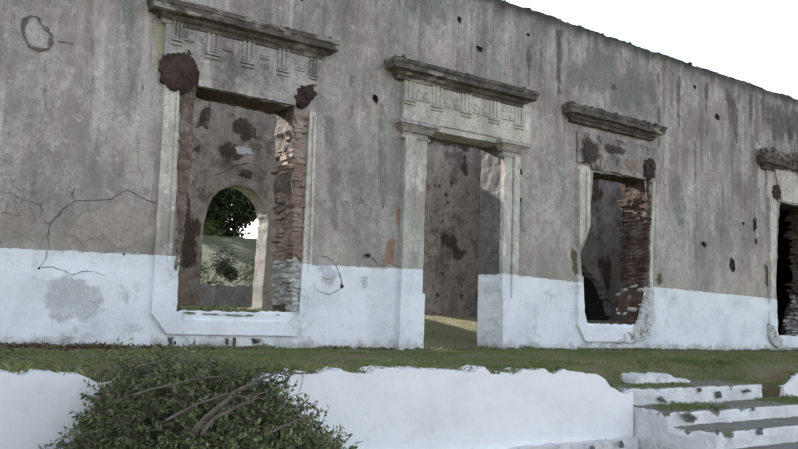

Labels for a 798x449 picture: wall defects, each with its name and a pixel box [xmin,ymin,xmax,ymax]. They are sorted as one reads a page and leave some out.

peeling [25,20,47,48]
crack [1,157,156,275]
spalling [158,49,199,305]
leakage [180,194,201,268]
leakage [197,107,211,129]
leakage [218,118,257,162]
spalling [270,85,318,312]
leakage [591,179,603,205]
leakage [583,139,626,163]
spalling [616,158,656,344]
spalling [772,185,781,200]
spalling [767,214,798,348]